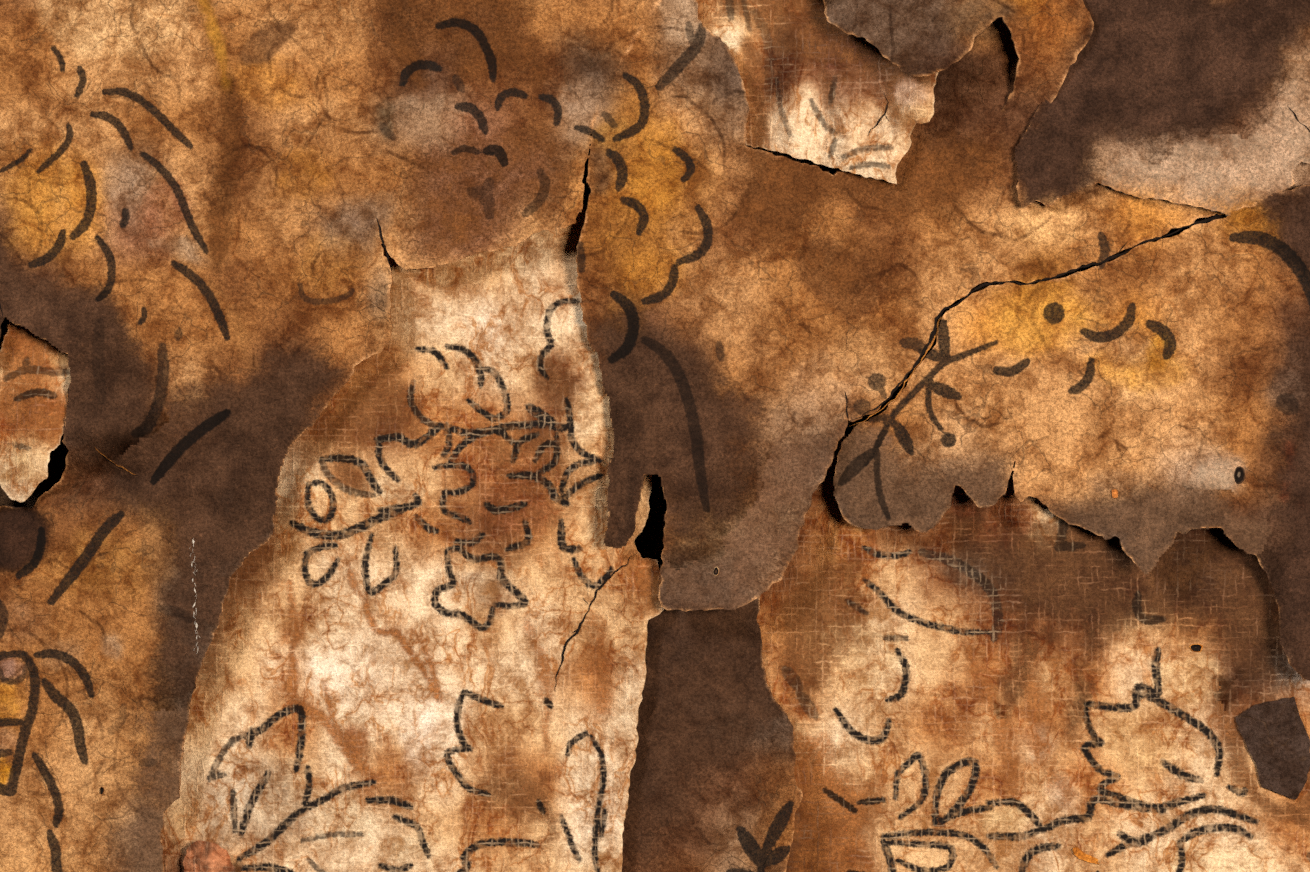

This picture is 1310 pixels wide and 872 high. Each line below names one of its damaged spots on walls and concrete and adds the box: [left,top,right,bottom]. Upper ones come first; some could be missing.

water stain [1015,0,1310,203]
crack [845,213,1223,425]
water stain [0,243,341,690]
peeling [1072,847,1099,864]